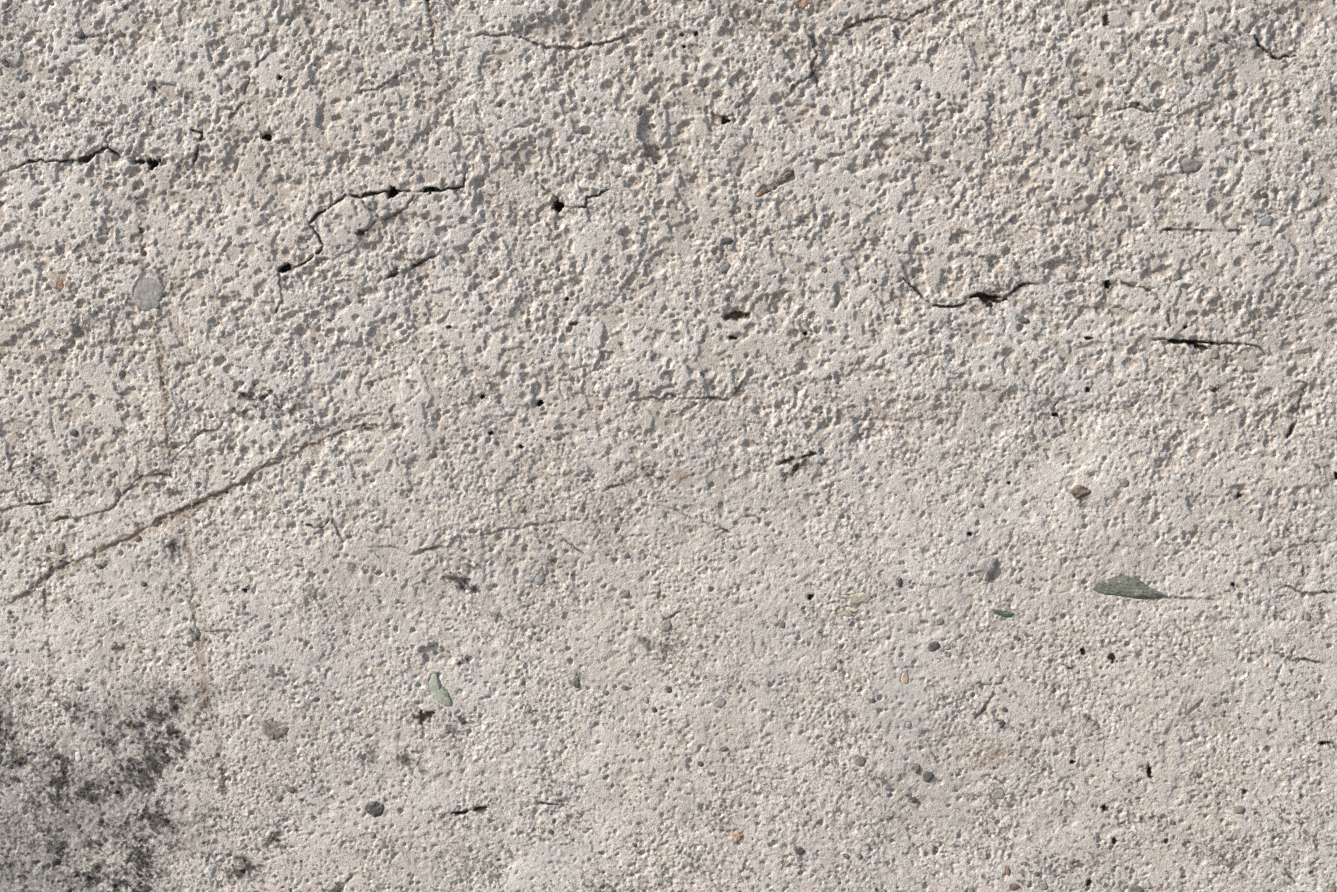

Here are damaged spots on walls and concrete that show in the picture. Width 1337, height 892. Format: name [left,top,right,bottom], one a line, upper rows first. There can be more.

crack [790,0,944,92]
crack [0,56,266,176]
crack [135,196,147,273]
crack [275,176,465,312]
crack [903,277,1088,308]
water stain [0,690,190,892]